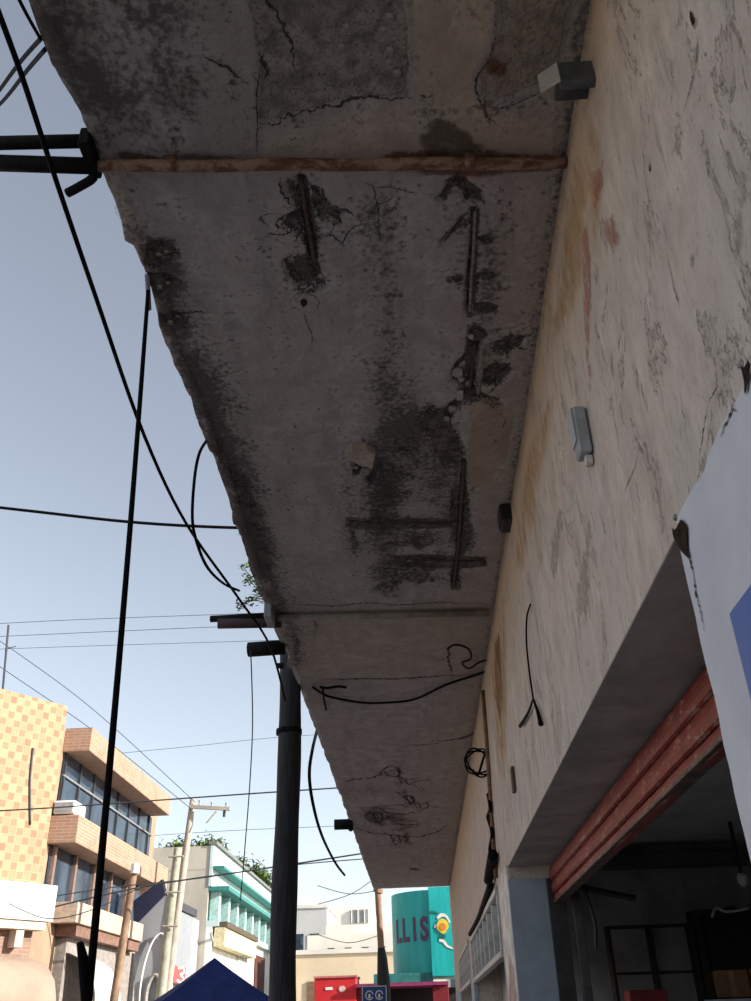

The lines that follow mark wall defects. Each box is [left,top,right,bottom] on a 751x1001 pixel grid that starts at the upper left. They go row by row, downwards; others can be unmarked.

spalling [275,171,353,293]
crack [204,0,433,157]
corrosion [97,150,567,192]
water stain [421,121,517,157]
crack [475,1,540,126]
spalling [345,173,535,590]
water stain [362,439,441,592]
crack [344,765,447,846]